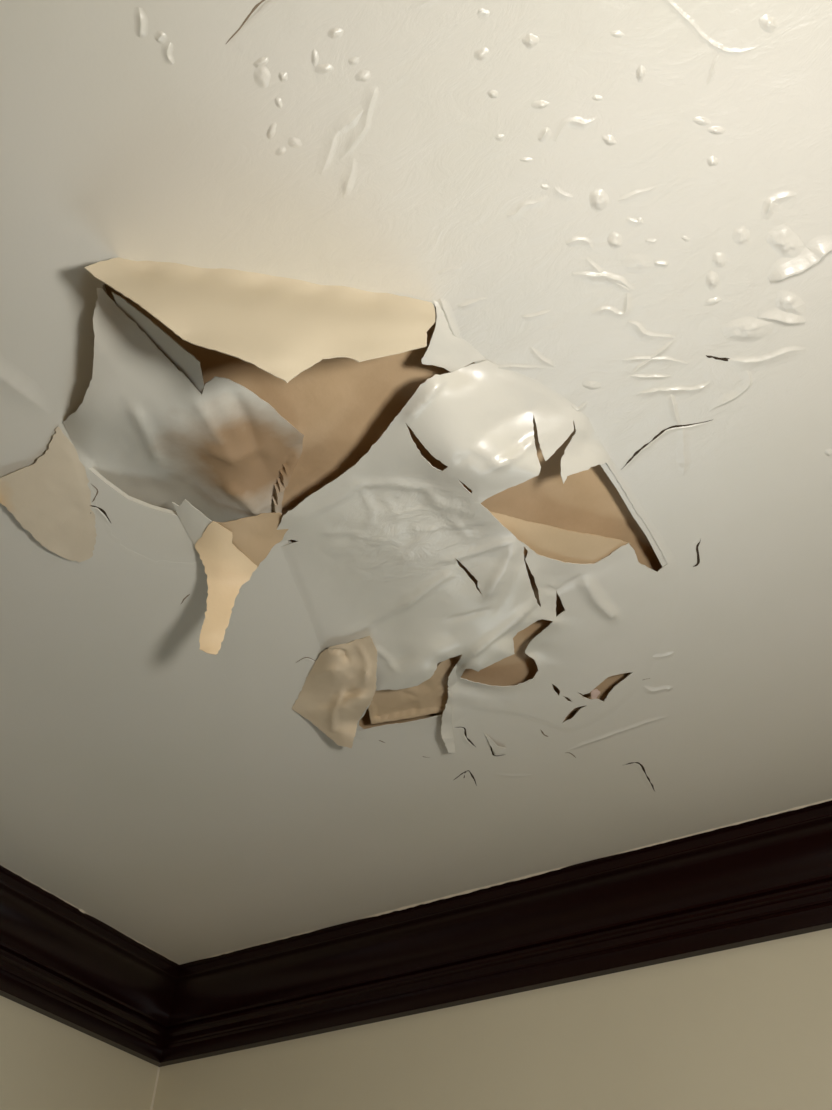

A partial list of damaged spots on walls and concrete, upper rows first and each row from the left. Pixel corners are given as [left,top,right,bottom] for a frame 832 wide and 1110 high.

peeling [0,257,680,753]
crack [454,727,502,786]
crack [622,762,655,793]